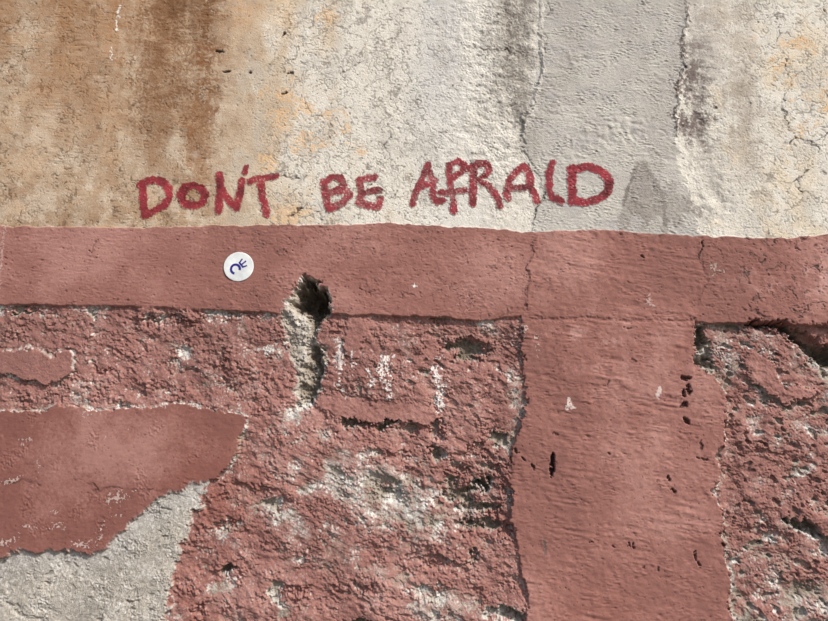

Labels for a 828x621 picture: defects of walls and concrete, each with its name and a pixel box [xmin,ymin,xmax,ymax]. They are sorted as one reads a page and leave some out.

leakage [402,0,828,236]
crack [772,13,828,204]
spalling [0,283,539,621]
spalling [679,375,692,425]
spalling [695,322,828,621]